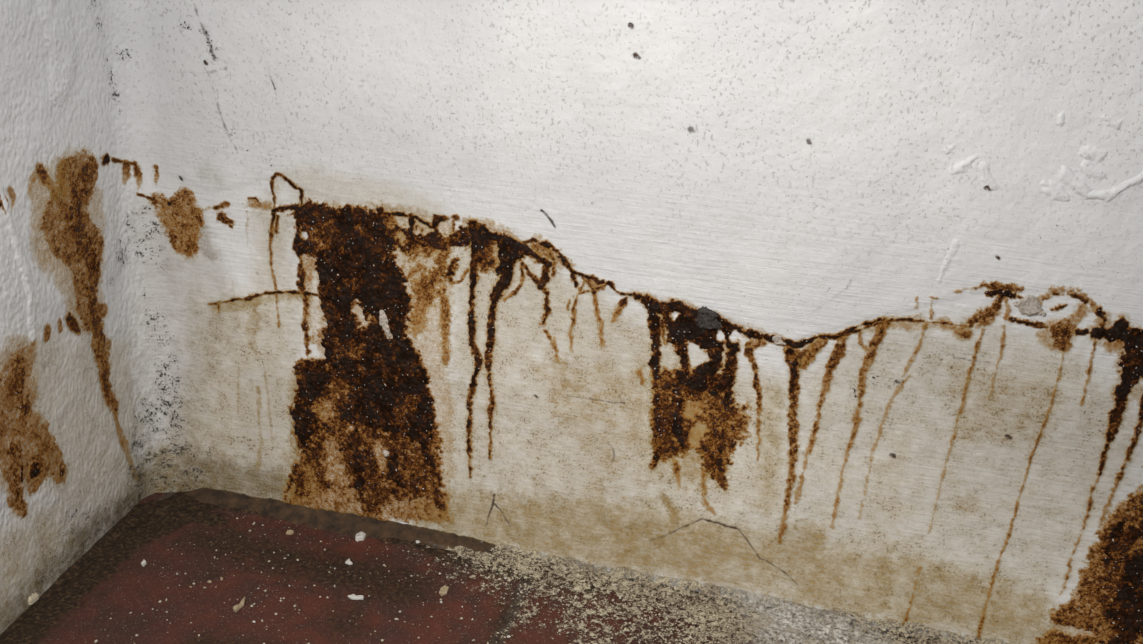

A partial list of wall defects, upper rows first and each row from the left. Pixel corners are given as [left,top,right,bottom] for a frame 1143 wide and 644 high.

rust [0,149,234,518]
water stain [0,298,297,629]
rust [246,172,1143,644]
crack [671,519,786,574]
water stain [415,253,1078,644]